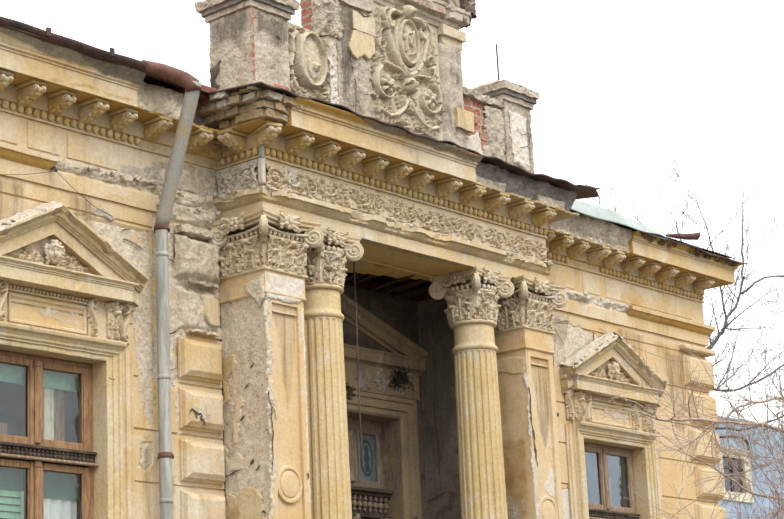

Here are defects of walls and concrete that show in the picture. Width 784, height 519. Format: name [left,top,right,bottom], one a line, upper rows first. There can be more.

spalling [120,161,169,189]
spalling [177,164,232,221]
spalling [168,223,221,443]
spalling [553,314,631,369]
peeling [222,272,311,519]
peeling [497,356,533,436]
peeling [530,447,571,519]